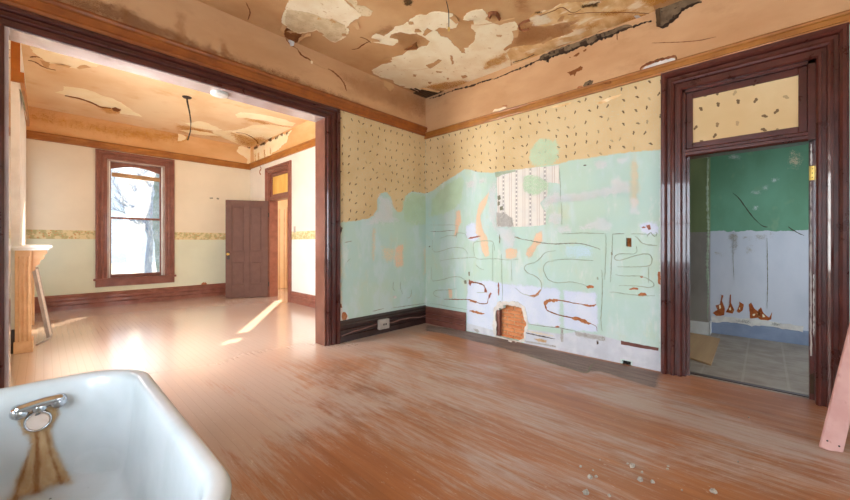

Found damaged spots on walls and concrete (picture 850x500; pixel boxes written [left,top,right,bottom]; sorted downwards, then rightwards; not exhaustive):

flaking render [28,46,99,70]
flaking render [280,0,373,46]
flaking render [370,0,702,91]
flaking render [55,86,142,117]
flaking render [176,112,295,164]
peeling [522,137,560,195]
peeling [464,151,661,372]